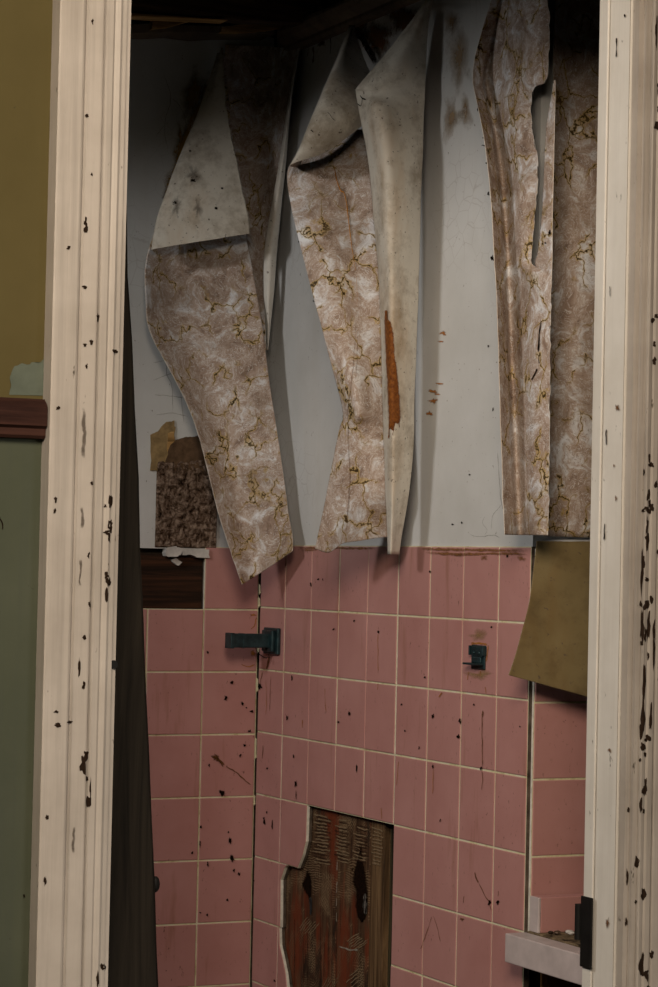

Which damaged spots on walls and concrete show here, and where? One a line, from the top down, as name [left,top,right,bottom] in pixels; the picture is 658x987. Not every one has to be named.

peeling [9,359,44,396]
spalling [150,421,217,566]
spalling [302,871,312,915]
spalling [353,848,368,922]